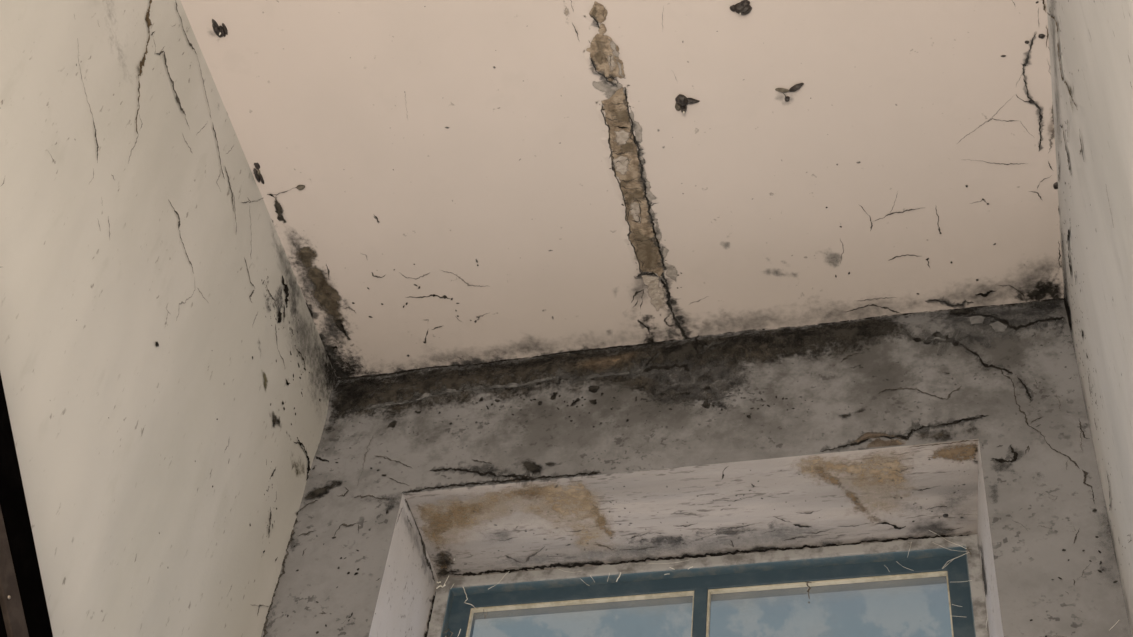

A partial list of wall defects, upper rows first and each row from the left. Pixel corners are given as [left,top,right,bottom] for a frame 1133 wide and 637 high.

crack [74,0,254,300]
crack [165,201,208,321]
damp [298,480,388,514]
crack [293,243,751,430]
crack [357,437,811,563]
spalling [564,0,682,311]
damp [421,484,968,577]
damp [337,225,1101,452]
damp [802,457,904,518]
crack [861,193,942,234]
crack [822,279,1132,562]
crack [958,0,1084,205]